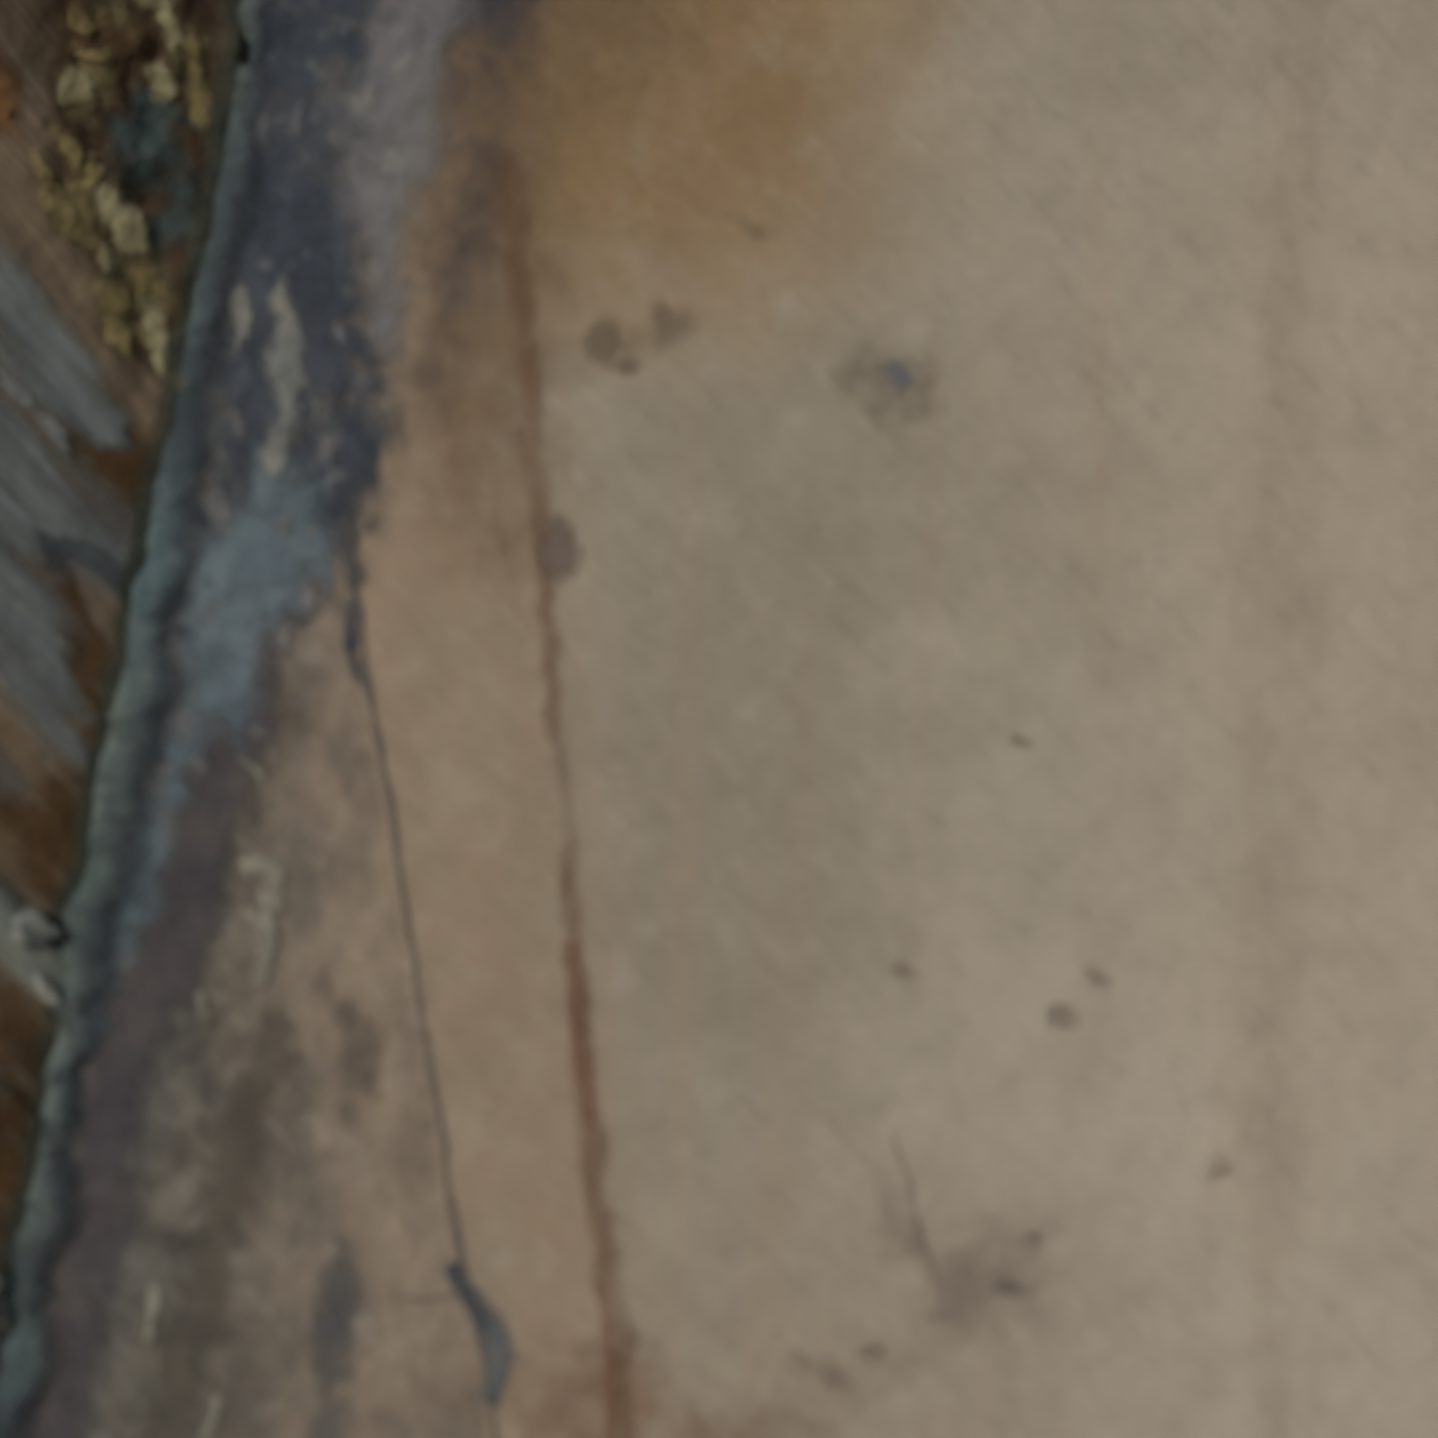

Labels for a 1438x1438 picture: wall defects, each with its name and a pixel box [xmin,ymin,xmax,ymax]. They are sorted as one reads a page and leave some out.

leakage [0,367,69,453]
leakage [26,0,512,1438]
crack [343,517,497,1438]